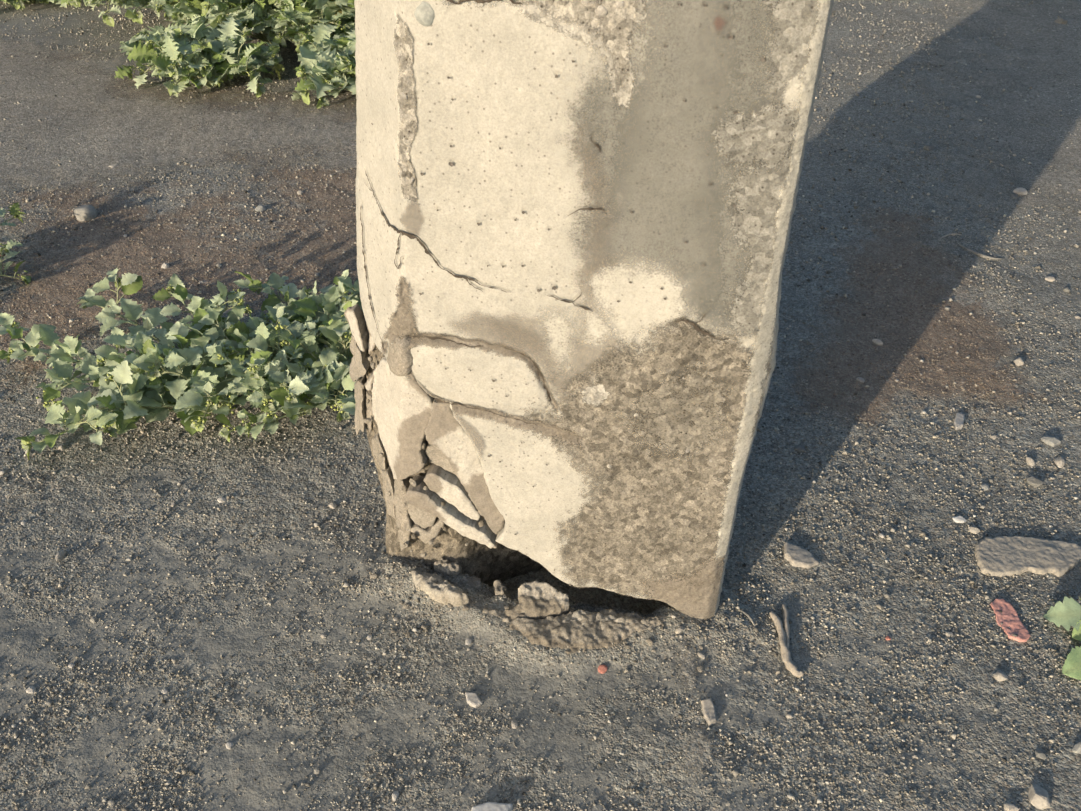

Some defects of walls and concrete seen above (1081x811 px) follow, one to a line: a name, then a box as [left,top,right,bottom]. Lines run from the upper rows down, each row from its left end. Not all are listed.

crack [360,171,511,350]
crack [409,336,551,425]
crack [547,292,591,311]
spalling [344,0,820,599]
crack [568,208,605,216]
leakage [572,0,777,335]